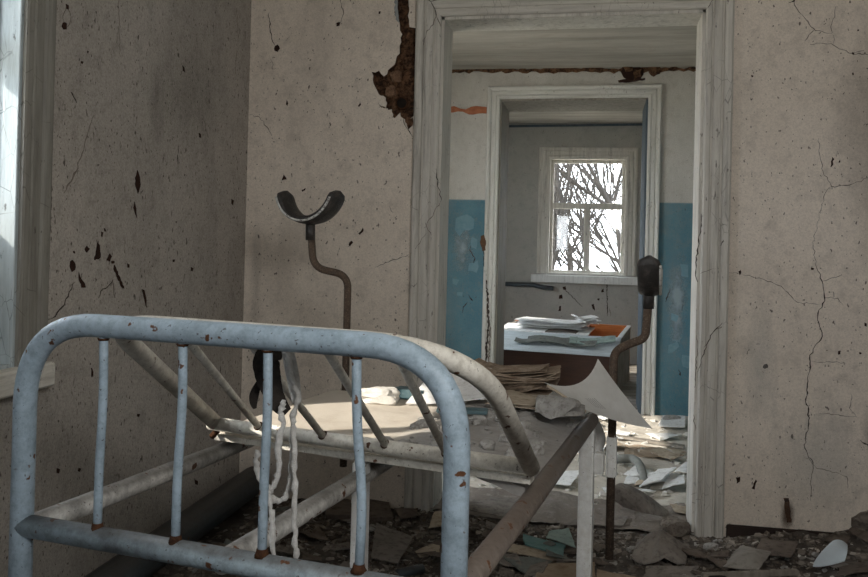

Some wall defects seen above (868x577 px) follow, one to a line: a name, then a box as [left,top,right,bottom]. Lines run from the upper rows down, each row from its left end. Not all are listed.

crack [789,0,868,55]
spalling [374,0,416,137]
spalling [618,67,661,83]
spalling [451,106,487,115]
crack [694,138,866,500]